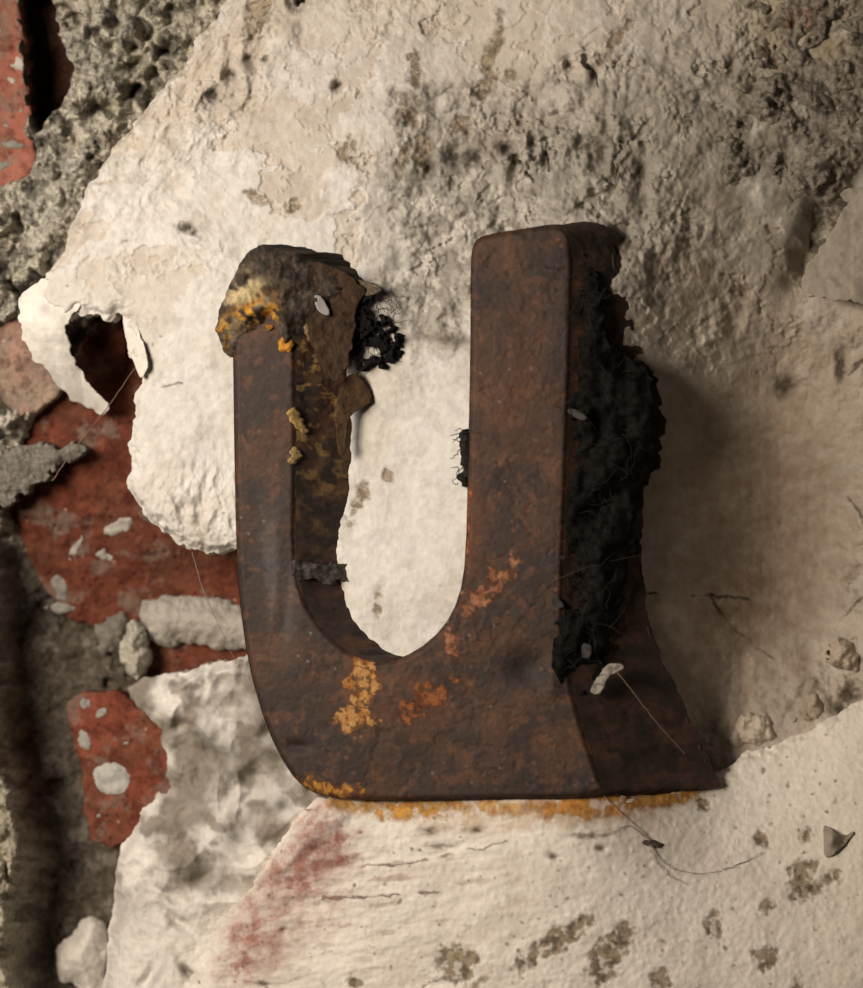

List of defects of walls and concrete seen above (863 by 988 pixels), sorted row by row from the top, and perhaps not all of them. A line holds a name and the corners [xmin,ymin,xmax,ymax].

spalling [0,0,37,186]
flaking render [801,187,863,304]
spalling [0,278,240,628]
corrosion [461,552,520,617]
spalling [148,640,247,677]
corrosion [332,657,382,733]
corrosion [399,678,459,726]
corrosion [444,628,458,657]
spalling [67,689,171,848]
corrosion [296,776,697,821]